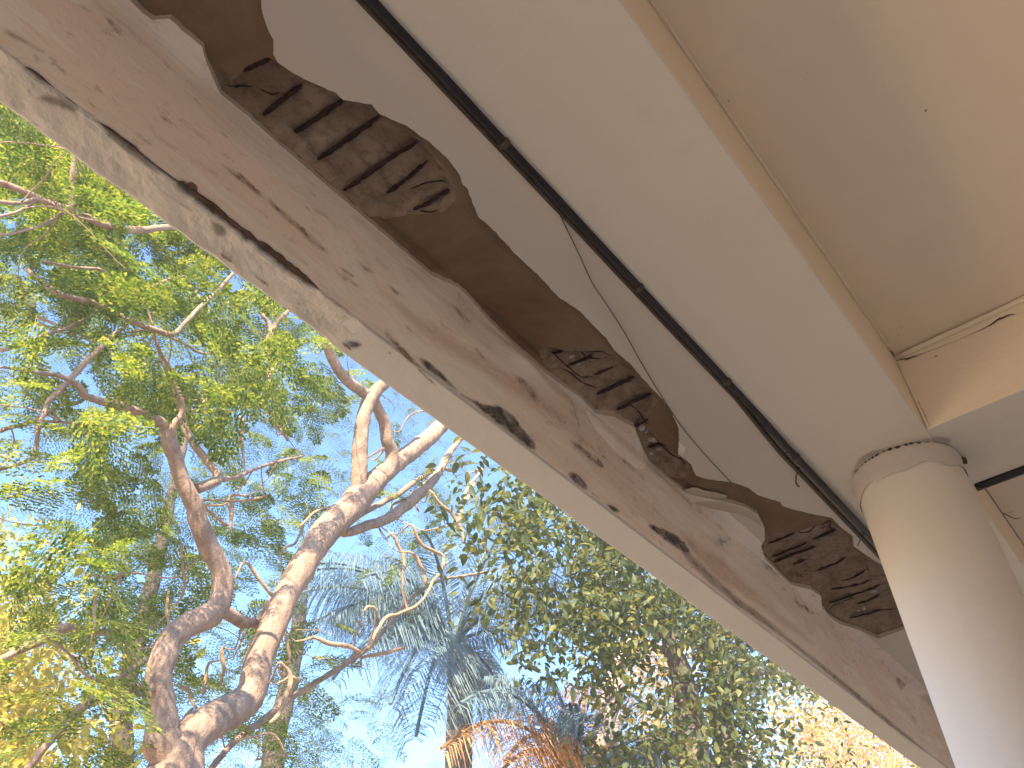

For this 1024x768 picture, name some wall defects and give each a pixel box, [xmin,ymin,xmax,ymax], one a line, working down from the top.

spalling [137,0,904,635]
water stain [473,401,534,449]
water stain [651,525,713,579]